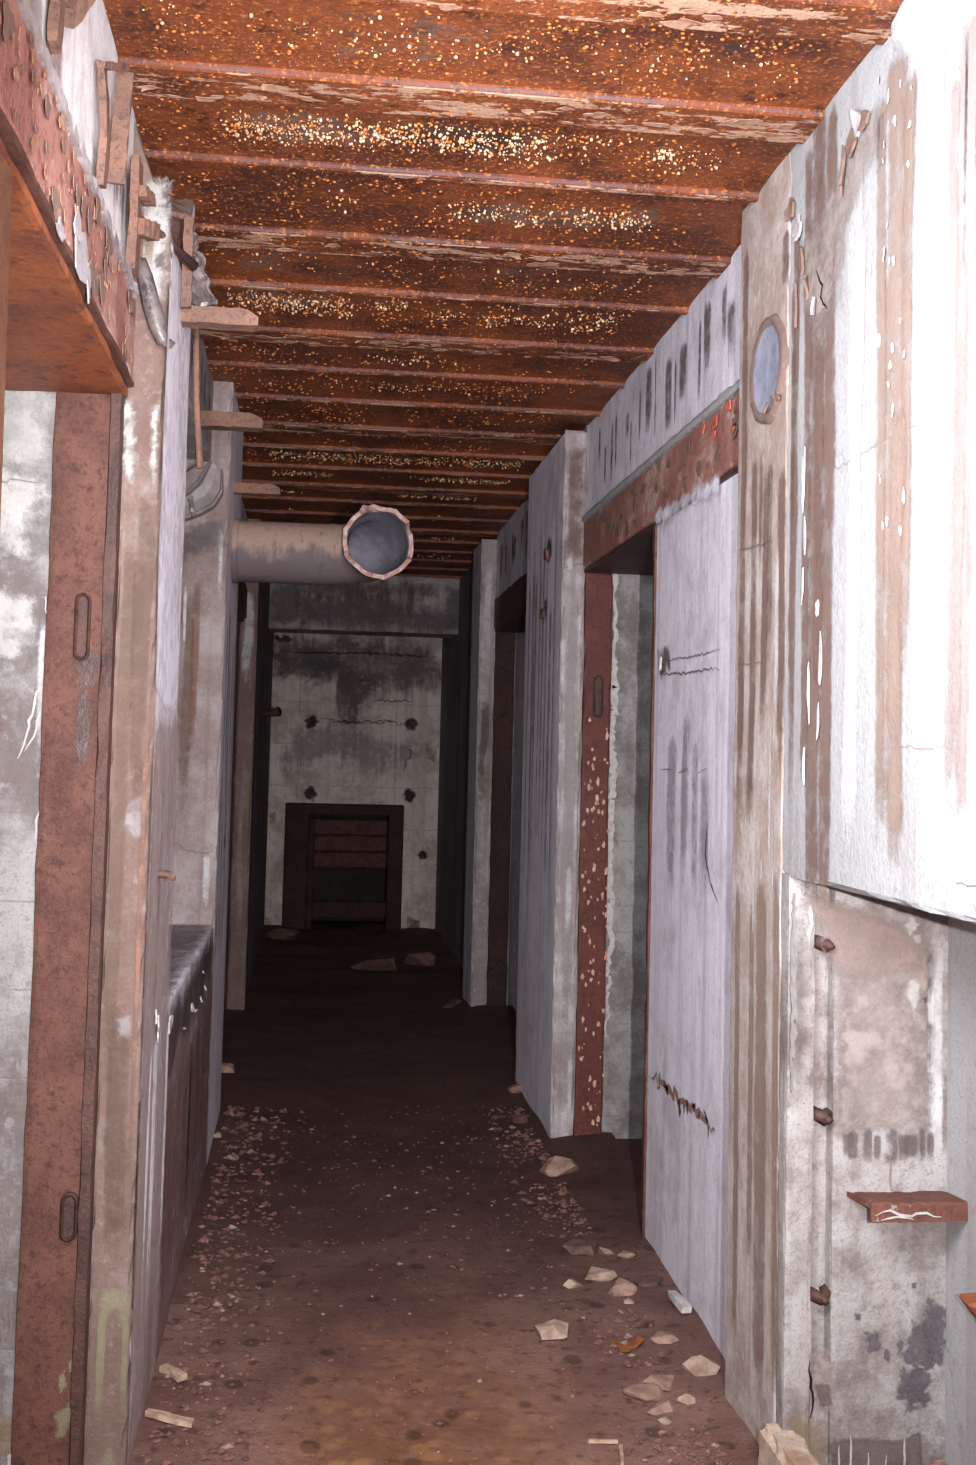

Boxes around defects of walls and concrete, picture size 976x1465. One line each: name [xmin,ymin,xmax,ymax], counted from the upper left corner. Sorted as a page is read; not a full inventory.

peeling [399,0,463,11]
peeling [638,9,723,30]
peeling [137,85,224,102]
peeling [521,106,669,128]
corrosion [127,158,146,236]
corrosion [160,229,199,271]
leakage [0,391,51,556]
leakage [0,592,47,759]
leakage [484,58,916,1376]
peeling [790,893,933,1130]
leakage [844,955,943,1161]
leakage [855,1283,946,1412]